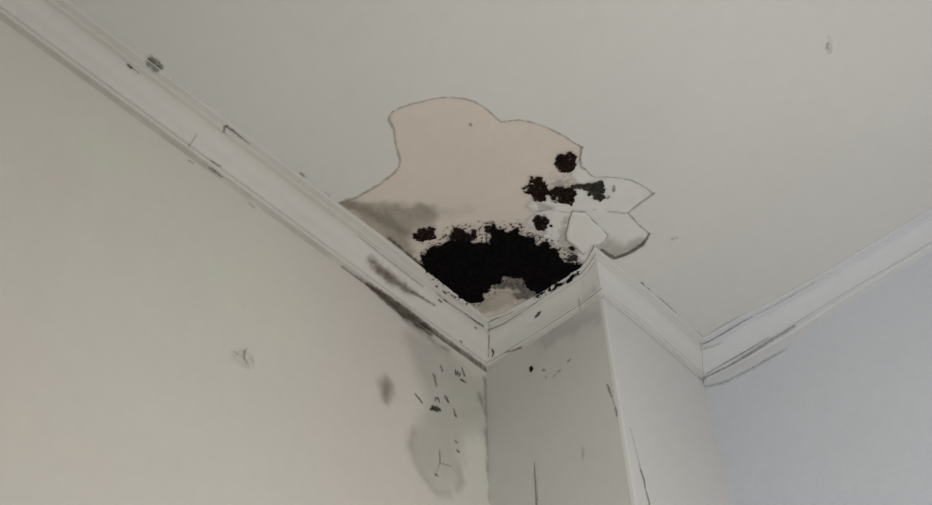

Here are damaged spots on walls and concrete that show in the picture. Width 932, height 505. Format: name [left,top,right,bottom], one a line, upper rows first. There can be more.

peeling [340,97,652,265]
leakage [554,152,577,173]
leakage [522,176,614,206]
leakage [347,271,486,370]
leakage [370,208,582,306]
peeling [470,276,532,317]